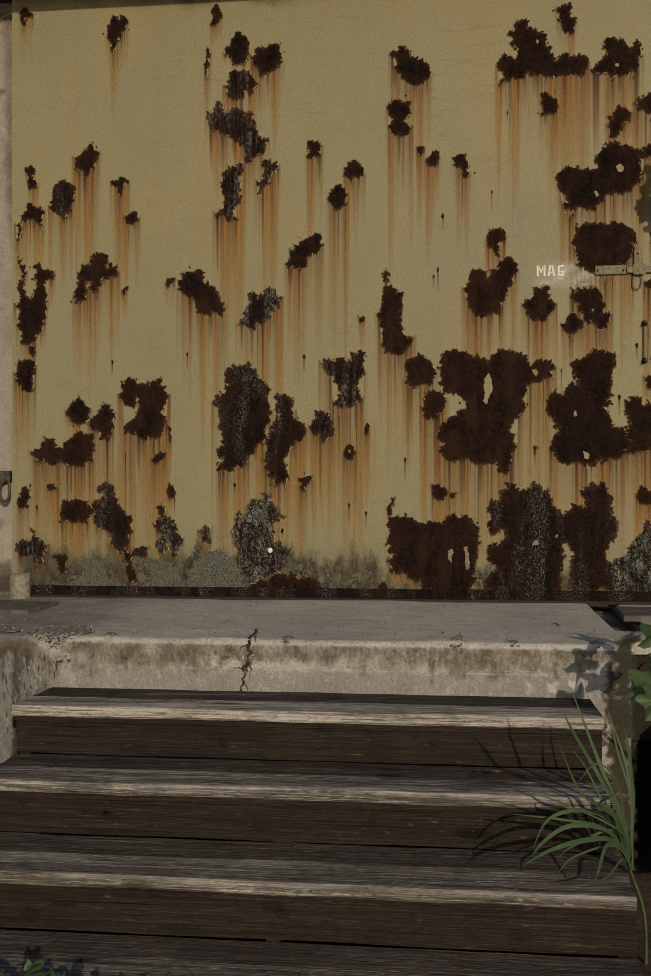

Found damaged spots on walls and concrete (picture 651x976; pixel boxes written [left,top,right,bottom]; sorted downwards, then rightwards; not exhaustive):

corrosion [13,141,140,419]
corrosion [165,1,651,592]
corrosion [15,376,184,584]
crack [234,628,258,691]
damp [67,642,612,696]